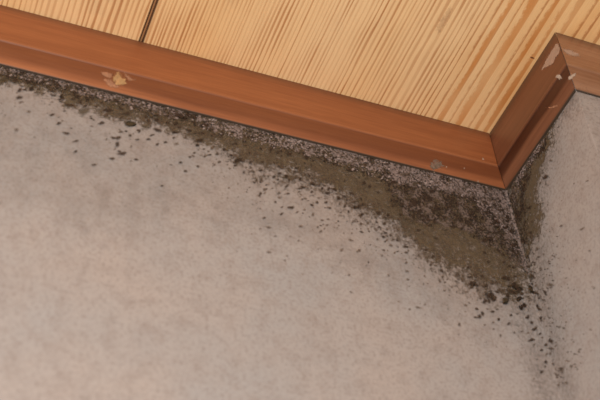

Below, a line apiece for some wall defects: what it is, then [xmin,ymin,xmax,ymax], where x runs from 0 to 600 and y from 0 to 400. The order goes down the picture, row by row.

water stain [0,66,582,386]